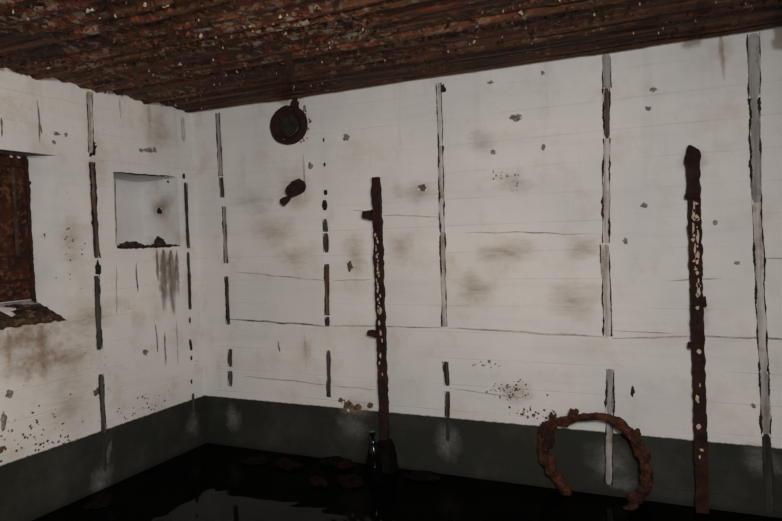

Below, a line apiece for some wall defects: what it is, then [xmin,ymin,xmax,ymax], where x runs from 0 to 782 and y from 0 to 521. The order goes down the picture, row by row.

corrosion [0,0,614,110]
water stain [156,250,179,310]